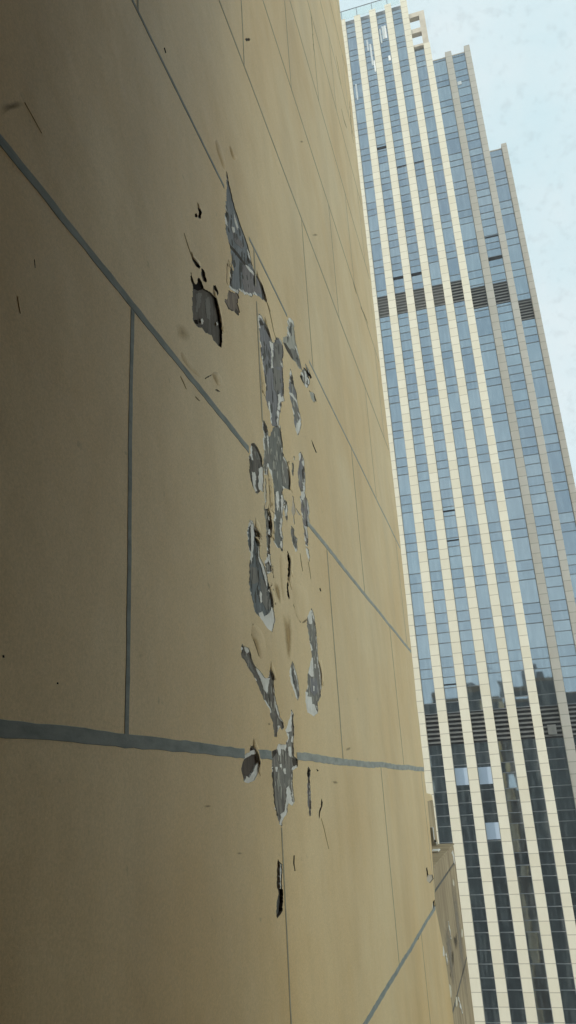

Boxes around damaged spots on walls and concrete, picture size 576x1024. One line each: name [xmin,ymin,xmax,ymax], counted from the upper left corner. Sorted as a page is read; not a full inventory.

peeling [190,171,268,348]
peeling [247,314,316,631]
peeling [241,608,324,826]